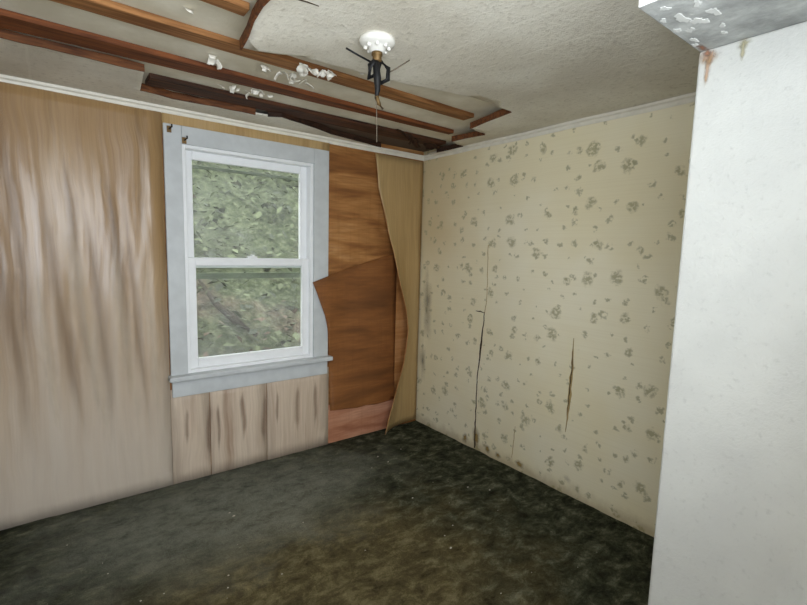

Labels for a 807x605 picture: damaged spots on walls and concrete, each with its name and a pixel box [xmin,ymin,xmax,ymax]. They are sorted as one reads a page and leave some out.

peeling [207,54,222,70]
peeling [217,84,273,100]
peeling [260,63,336,89]
rust [698,46,714,82]
peeling [375,153,424,435]
crack [474,245,489,448]
crack [565,338,574,432]